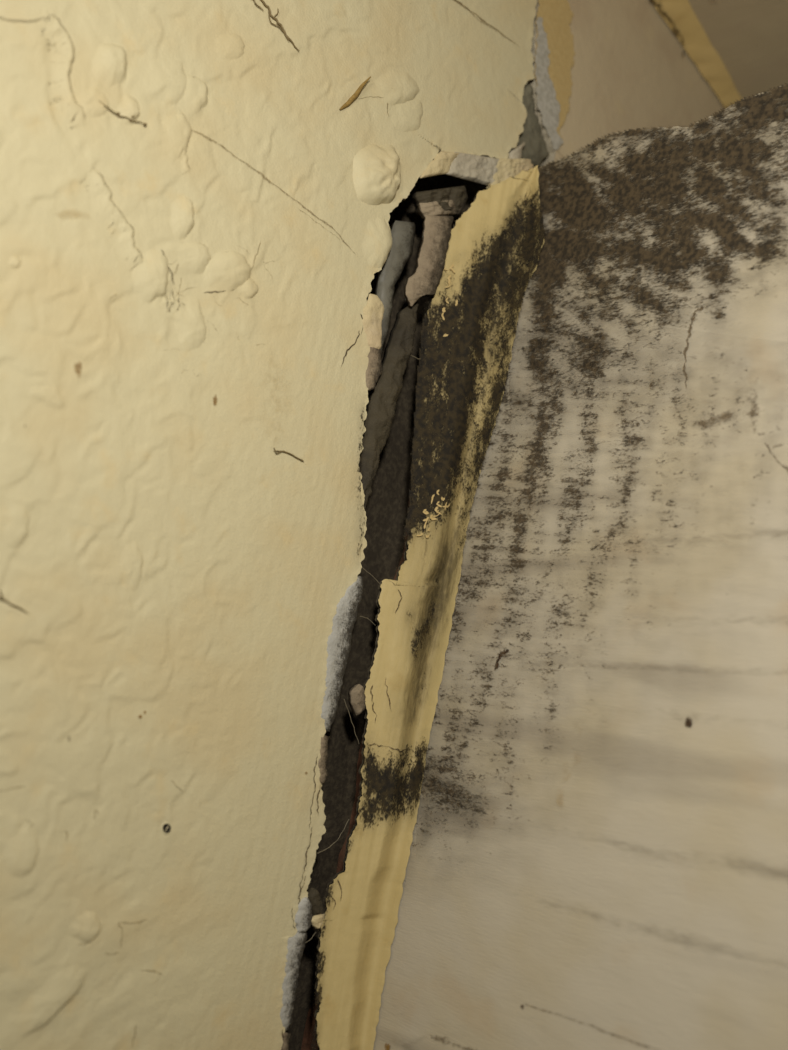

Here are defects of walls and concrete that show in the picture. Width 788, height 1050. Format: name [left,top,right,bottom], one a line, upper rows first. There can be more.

spalling [534,0,575,150]
crack [394,498,410,613]
crack [340,83,549,510]
damp [344,83,788,853]
crack [280,576,406,1050]